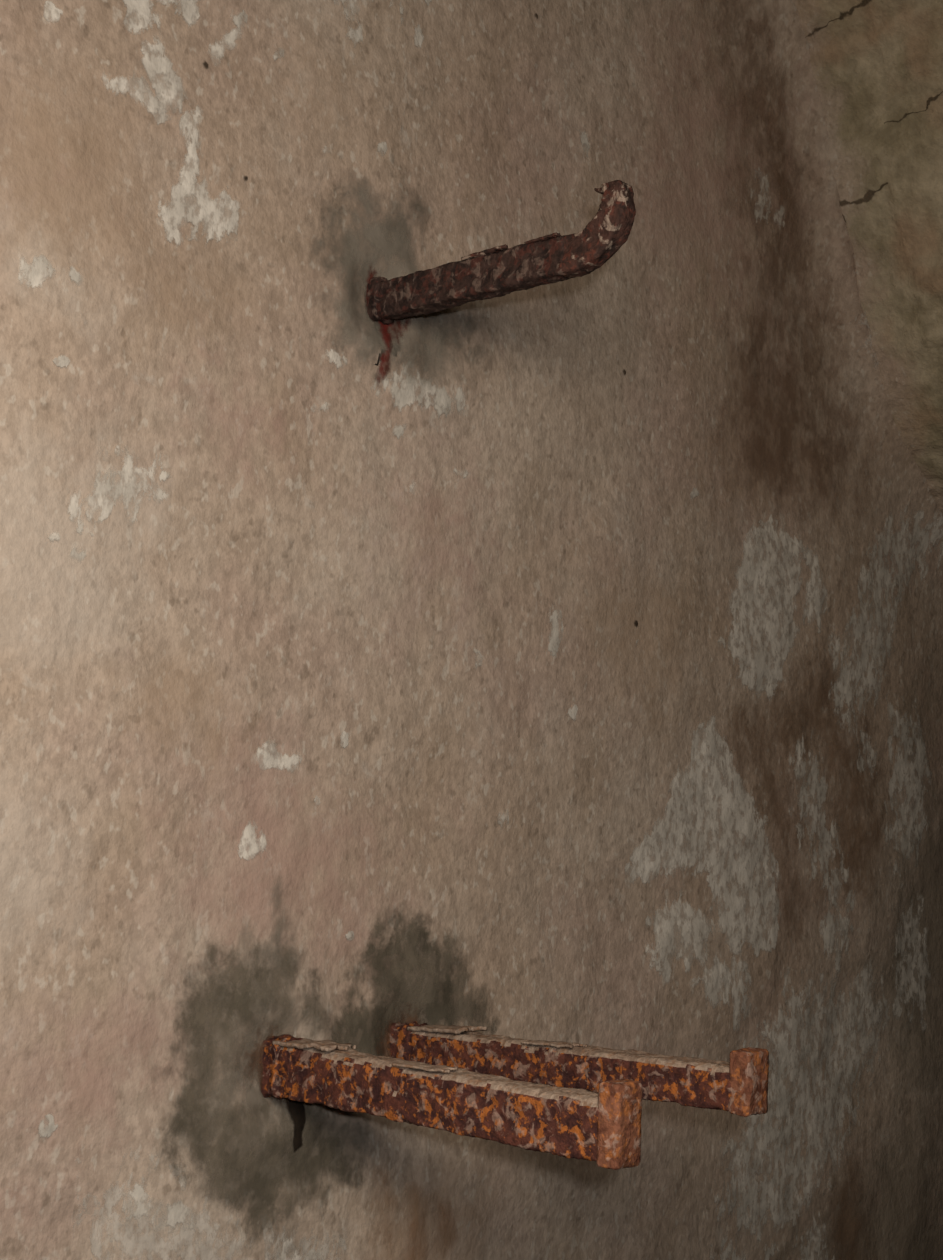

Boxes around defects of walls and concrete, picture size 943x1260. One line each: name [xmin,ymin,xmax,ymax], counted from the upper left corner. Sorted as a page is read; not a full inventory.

peeling [44,1,63,21]
peeling [209,10,248,58]
crack [805,0,871,38]
peeling [103,0,239,244]
crack [885,92,942,123]
crack [839,182,888,222]
corrosion [461,244,509,261]
corrosion [524,232,561,244]
leakage [337,215,448,374]
corrosion [379,319,408,378]
leakage [173,915,496,1230]
corrosion [392,1061,458,1073]